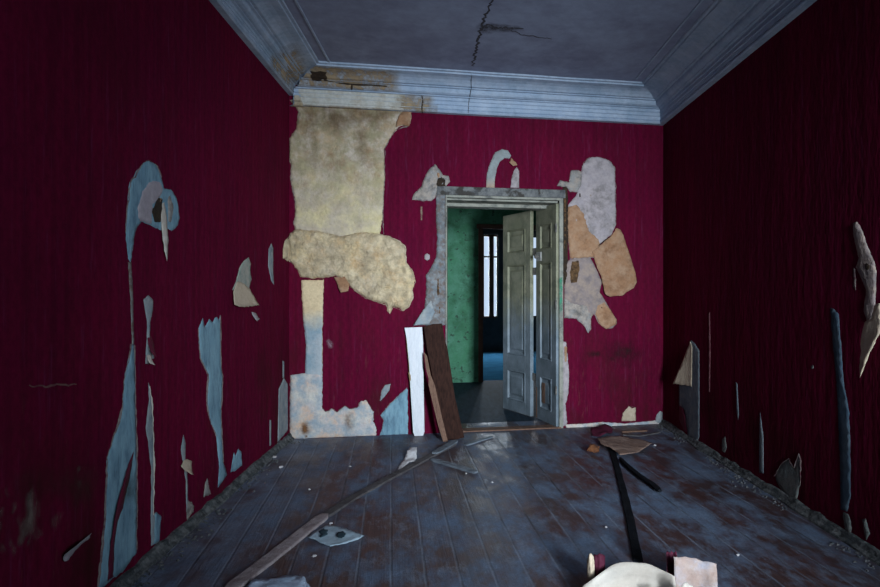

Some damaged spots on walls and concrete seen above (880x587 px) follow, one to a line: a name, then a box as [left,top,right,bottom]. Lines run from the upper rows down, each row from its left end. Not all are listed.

peeling [291,71,405,111]
crack [468,0,550,113]
flaking render [412,164,450,326]
flaking render [557,170,617,333]
flaking render [290,373,377,439]
peeling [181,459,193,475]